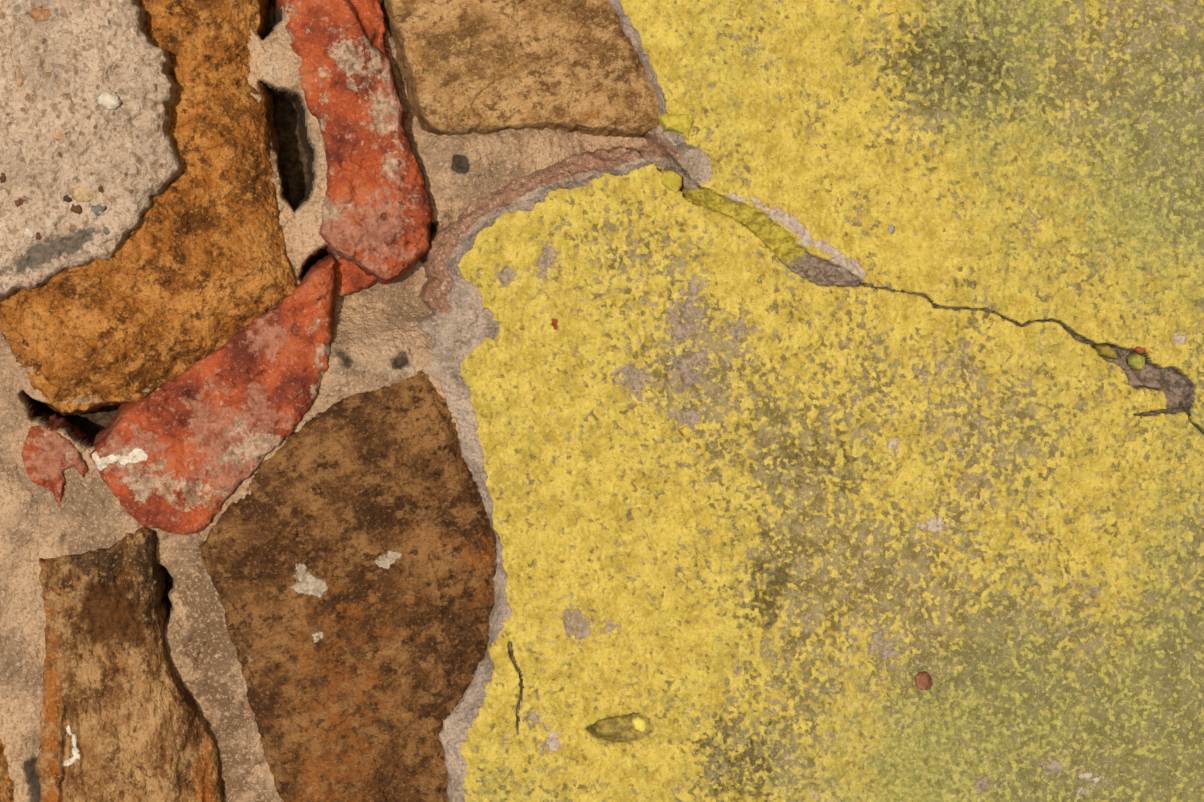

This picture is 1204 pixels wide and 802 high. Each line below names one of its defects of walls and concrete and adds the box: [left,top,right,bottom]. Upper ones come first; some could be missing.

crack [663,152,1096,345]
spalling [417,0,713,802]
crack [1133,406,1204,435]
crack [507,641,524,735]